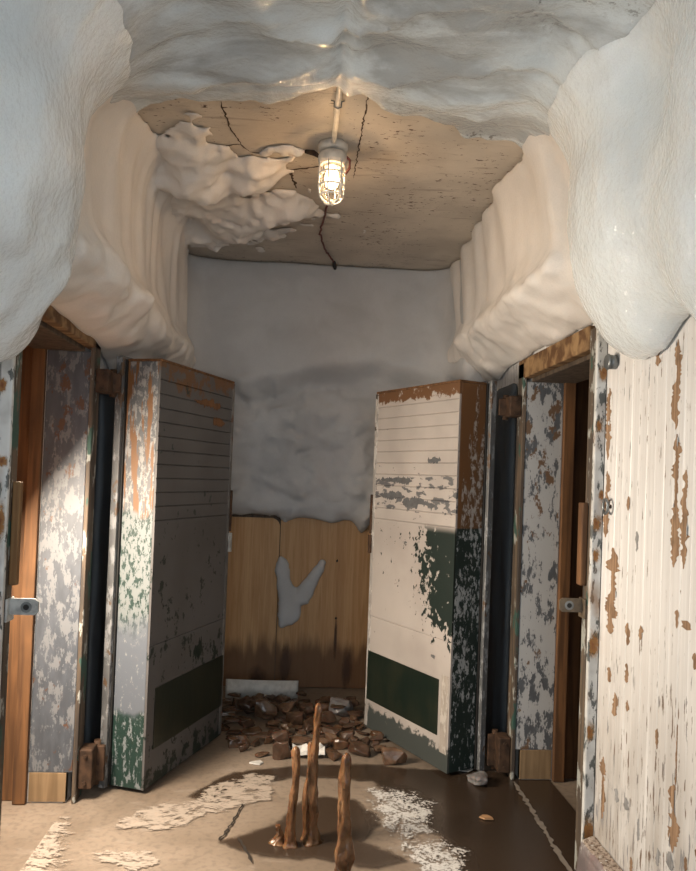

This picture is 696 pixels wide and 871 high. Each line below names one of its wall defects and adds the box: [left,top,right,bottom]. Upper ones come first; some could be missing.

crack [221,102,260,154]
crack [353,97,369,178]
crack [288,166,319,188]
peeling [670,339,690,569]
peeling [380,476,435,510]
peeling [604,548,620,634]
crack [218,804,252,862]
damp [189,765,308,802]
damp [220,797,338,862]
damp [318,764,340,778]
damp [350,764,576,871]
peeling [655,724,696,871]